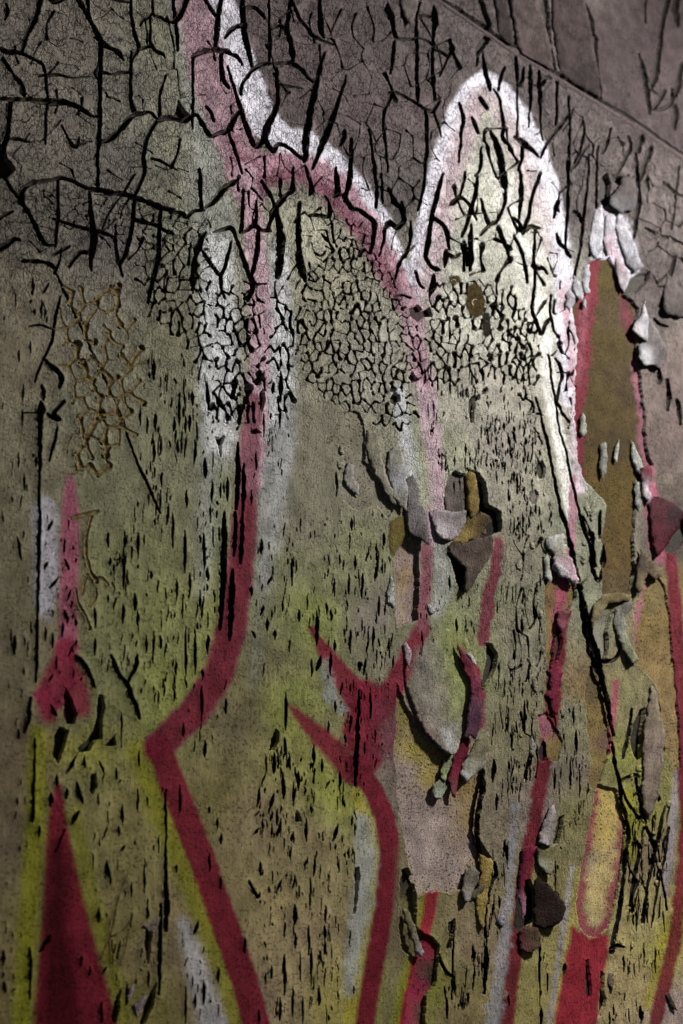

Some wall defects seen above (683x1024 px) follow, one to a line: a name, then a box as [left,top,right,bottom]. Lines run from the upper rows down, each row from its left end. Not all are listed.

crack [0,0,683,811]
peeling [365,415,494,594]
peeling [565,264,591,311]
peeling [579,413,587,437]
peeling [591,438,683,663]
peeling [632,301,668,369]
peeling [663,273,683,318]
peeling [403,628,490,799]
peeling [461,854,506,929]
peeling [517,805,566,929]
crack [543,701,589,898]
crack [609,708,670,980]